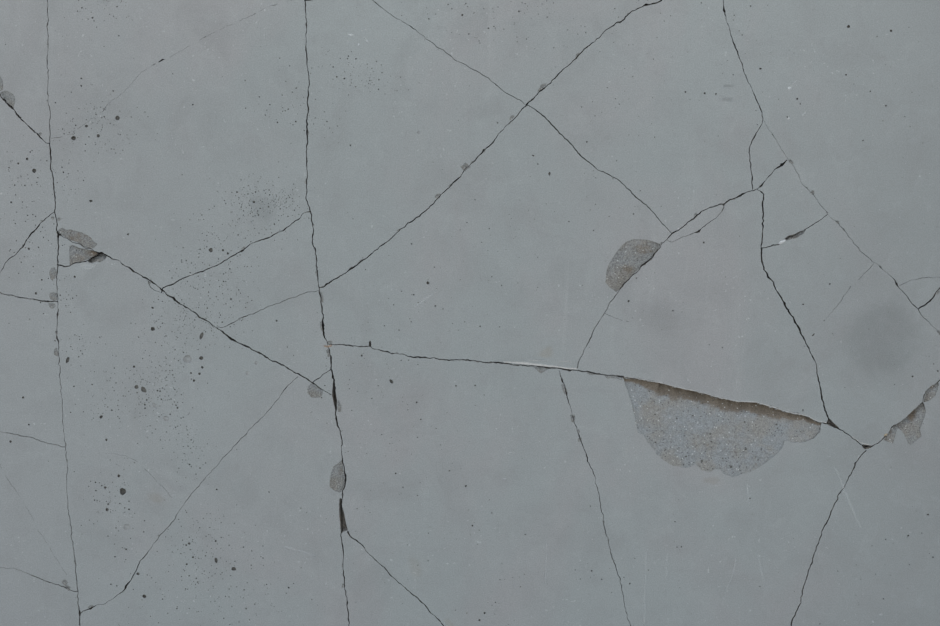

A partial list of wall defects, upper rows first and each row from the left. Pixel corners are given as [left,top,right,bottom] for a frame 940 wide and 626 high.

crack [726,21,762,112]
crack [0,94,117,324]
spalling [58,228,108,265]
crack [121,0,668,626]
spalling [605,239,661,292]
crack [893,277,940,335]
crack [3,432,68,487]
crack [54,331,64,431]
spalling [588,373,821,477]
crack [603,159,886,626]
spalling [884,382,939,445]
crack [6,466,217,625]